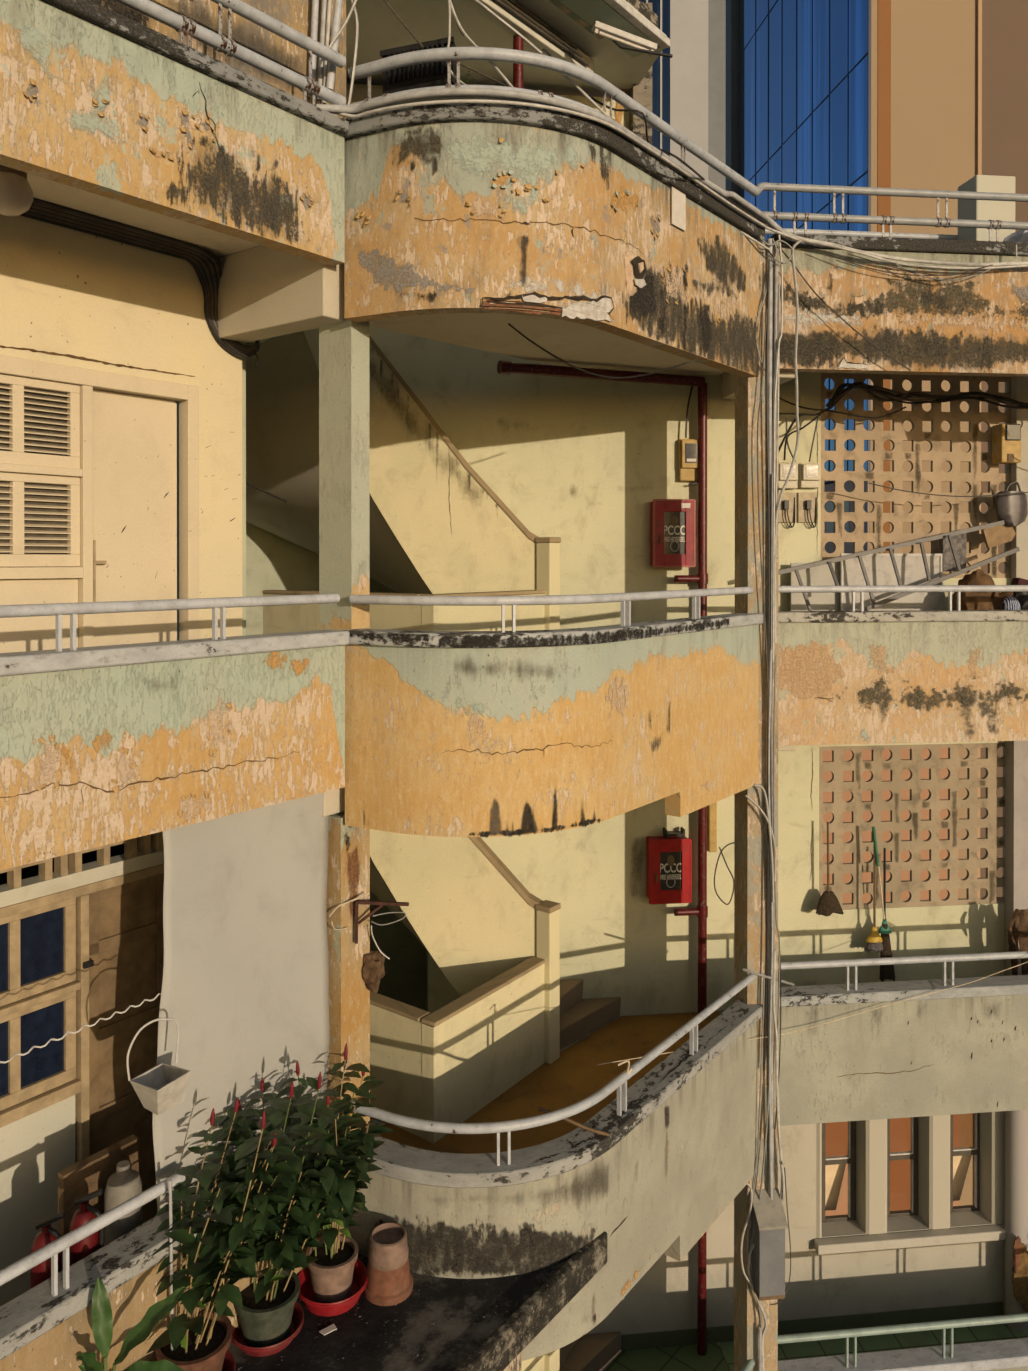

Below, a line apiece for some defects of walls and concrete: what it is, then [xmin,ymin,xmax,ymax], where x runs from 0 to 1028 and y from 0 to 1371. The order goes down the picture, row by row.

peeling [70,76,121,142]
damp [166,137,302,243]
peeling [447,133,586,218]
crack [415,218,641,252]
spalling [358,248,615,322]
damp [623,235,761,376]
damp [780,267,1028,373]
peeling [263,651,309,676]
crack [0,751,299,803]
crack [443,740,613,755]
damp [469,789,600,838]
damp [375,1216,595,1277]